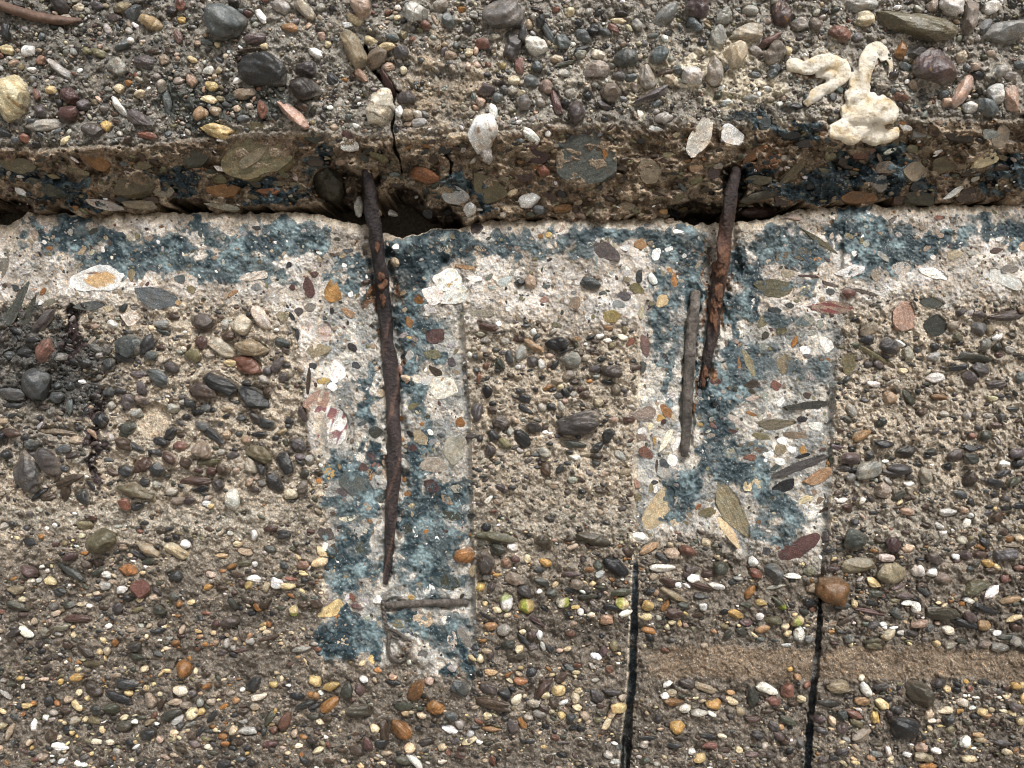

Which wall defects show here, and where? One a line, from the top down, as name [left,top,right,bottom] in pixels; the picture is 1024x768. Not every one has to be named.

rust [362,272,404,312]
rust [701,251,740,334]
damp [313,39,1024,681]
rust [692,365,728,414]